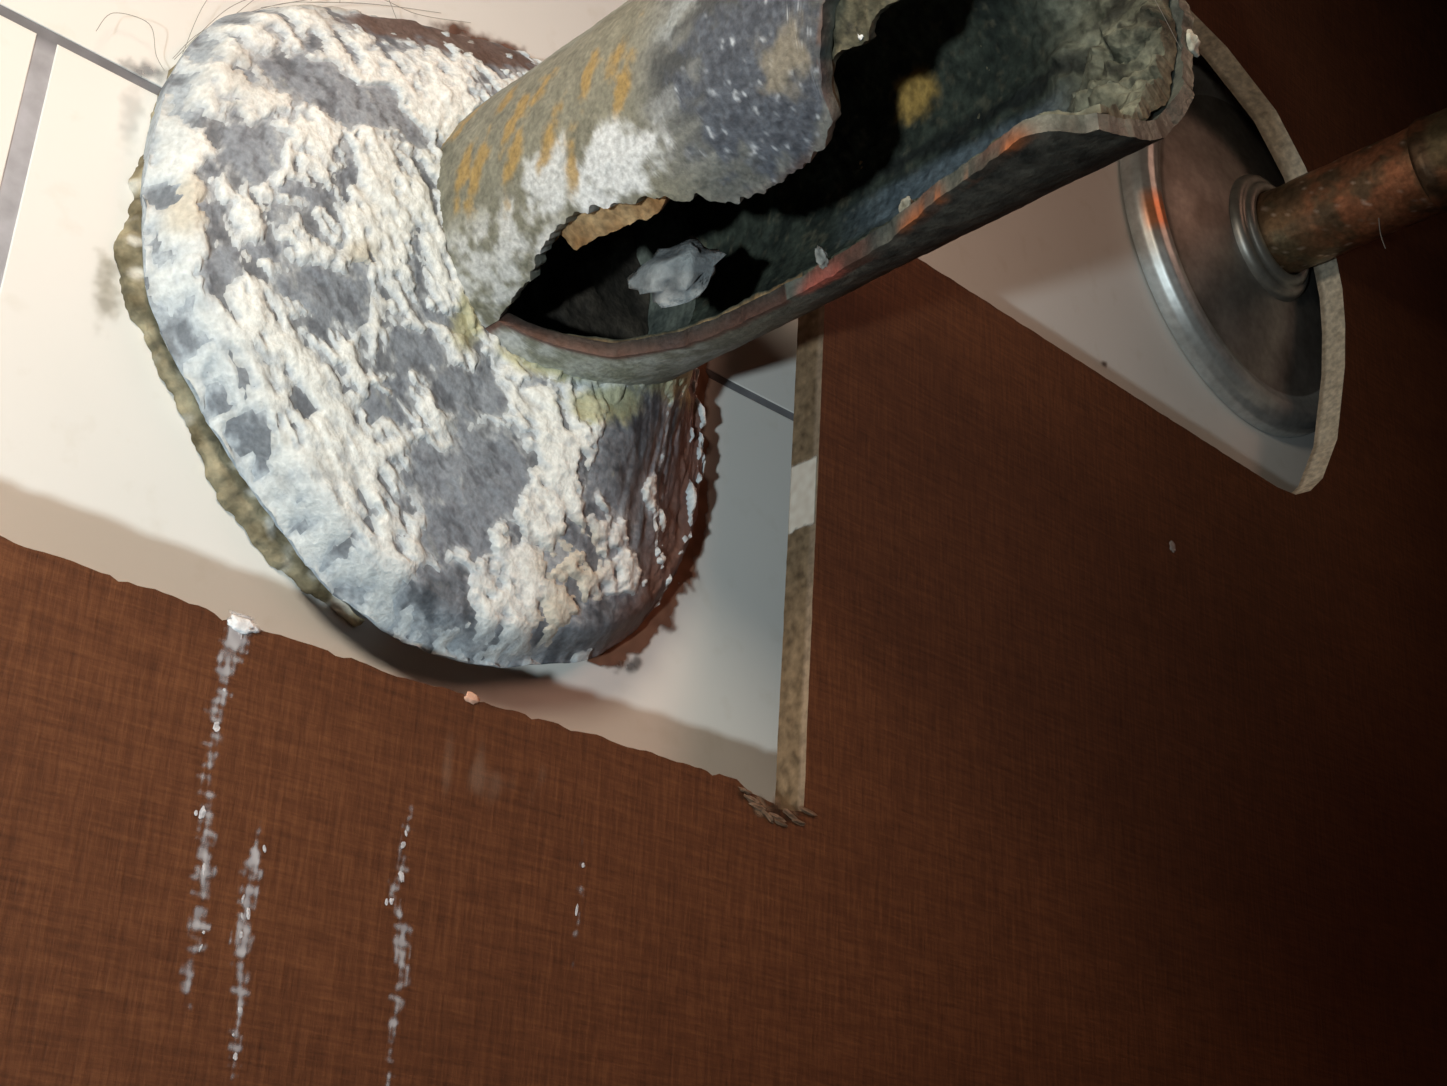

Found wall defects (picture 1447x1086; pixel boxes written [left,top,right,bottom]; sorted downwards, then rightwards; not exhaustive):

leakage [213,612,253,738]
leakage [185,793,216,992]
leakage [232,845,266,1060]
leakage [385,867,410,1027]